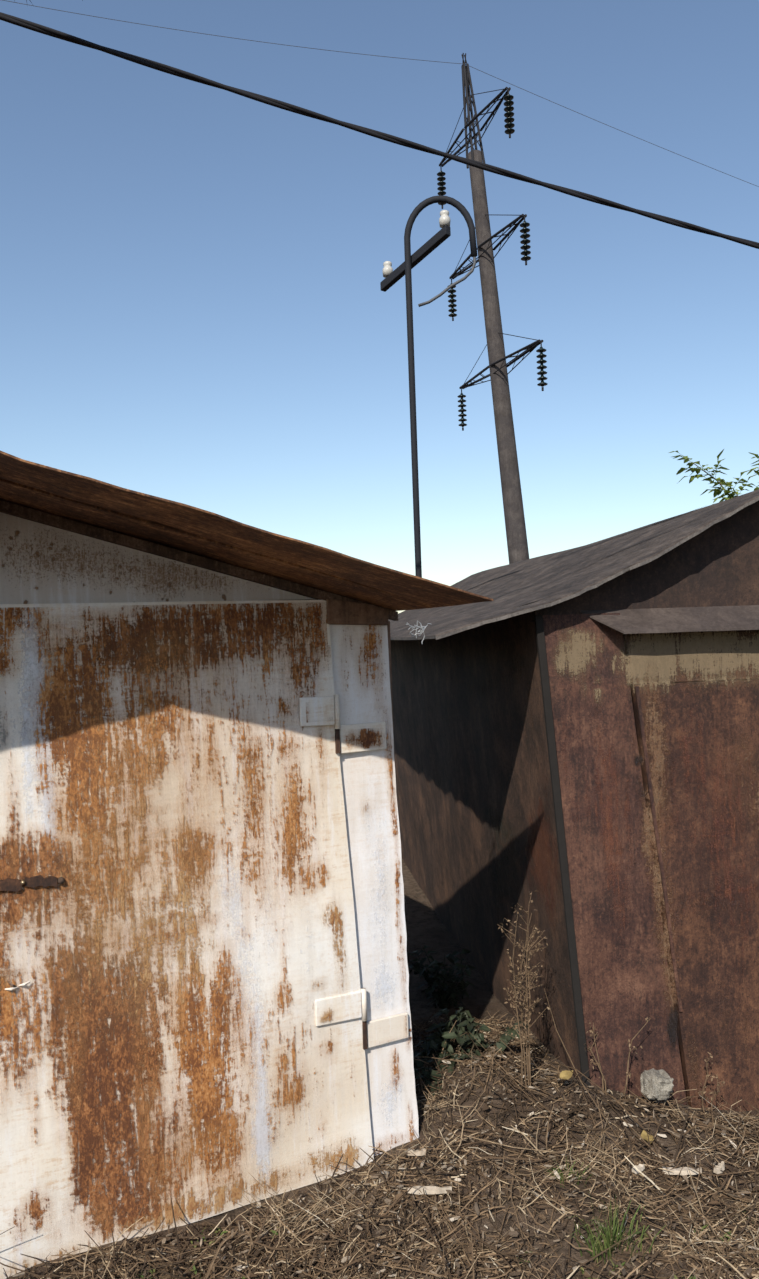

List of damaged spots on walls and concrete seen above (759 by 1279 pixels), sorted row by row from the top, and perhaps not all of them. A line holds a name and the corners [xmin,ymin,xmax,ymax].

corrosion [0,521,359,1274]
corrosion [343,625,398,836]
peeling [554,627,759,702]
corrosion [634,681,759,1047]